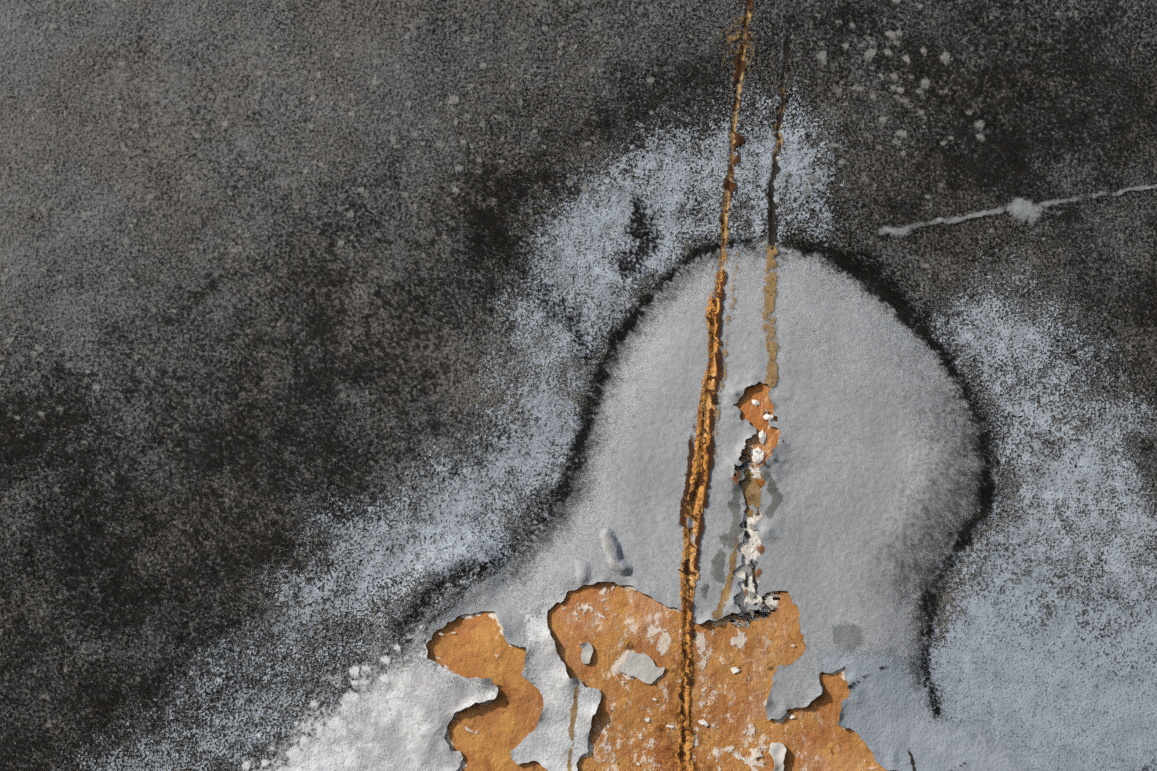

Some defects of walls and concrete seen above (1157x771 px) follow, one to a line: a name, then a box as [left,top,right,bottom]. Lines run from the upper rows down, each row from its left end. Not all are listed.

corrosion [657,6,754,771]
corrosion [762,244,779,388]
peeling [547,382,896,771]
peeling [426,611,548,771]
water stain [510,578,601,771]